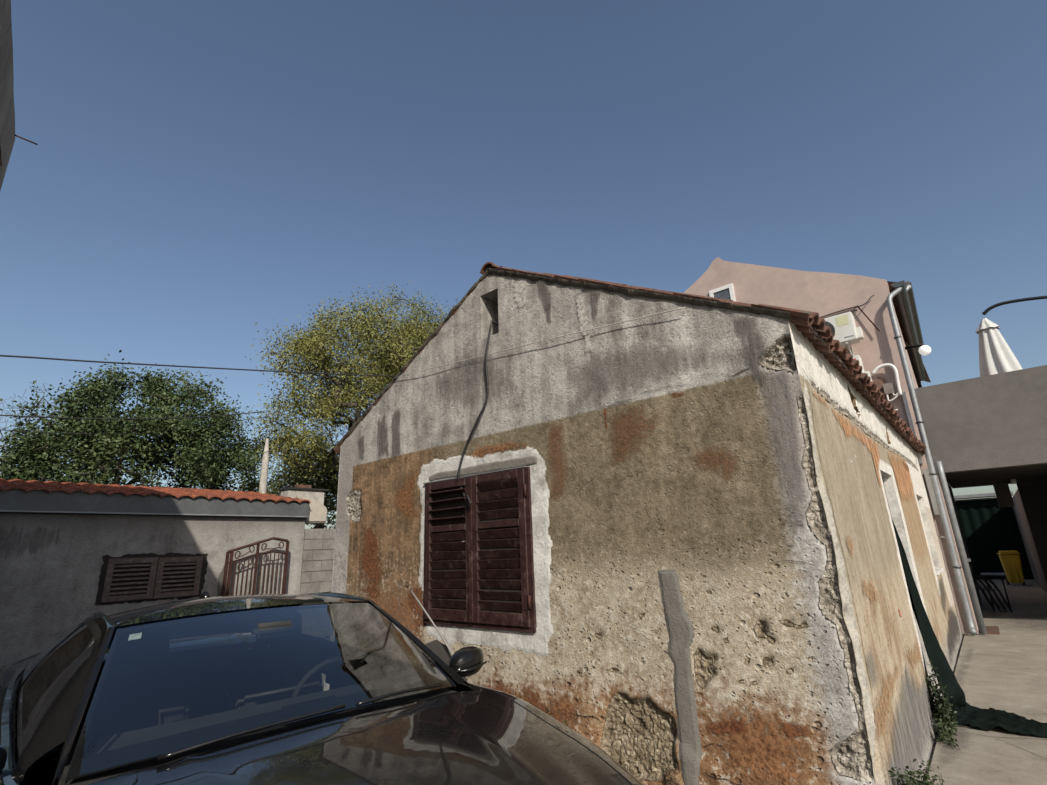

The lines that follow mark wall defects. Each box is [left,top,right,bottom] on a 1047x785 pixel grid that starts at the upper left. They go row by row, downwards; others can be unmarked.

leakage [512,280,551,322]
leakage [576,291,600,351]
spalling [758,335,796,373]
leakage [377,409,400,456]
corrosion [814,392,914,500]
corrosion [360,528,427,642]
spalling [797,396,874,782]
leakage [939,579,961,662]
corrosion [478,679,575,728]
spalling [601,692,677,781]
spalling [694,647,719,690]
corrosion [708,704,810,785]